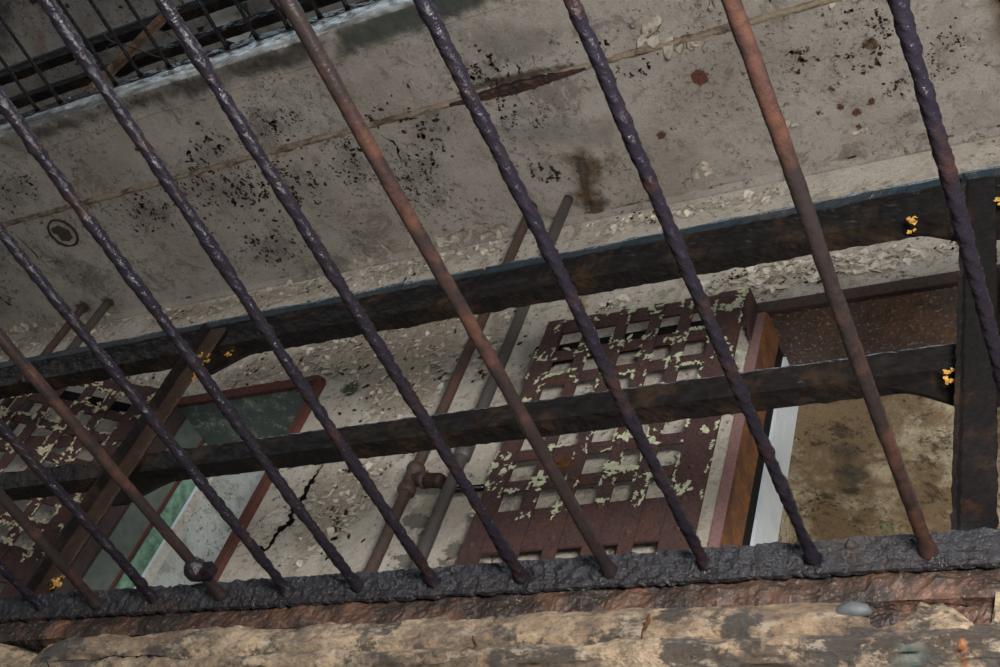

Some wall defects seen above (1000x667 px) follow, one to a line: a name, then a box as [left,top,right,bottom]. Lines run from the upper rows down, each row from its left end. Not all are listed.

leakage [572,152,606,214]
peeling [483,308,516,356]
peeling [520,334,590,402]
peeling [589,294,714,385]
crack [258,464,323,552]
peeling [485,448,549,520]
peeling [595,428,653,507]
peeling [671,439,703,499]
peeling [685,419,720,473]
crack [46,654,187,667]